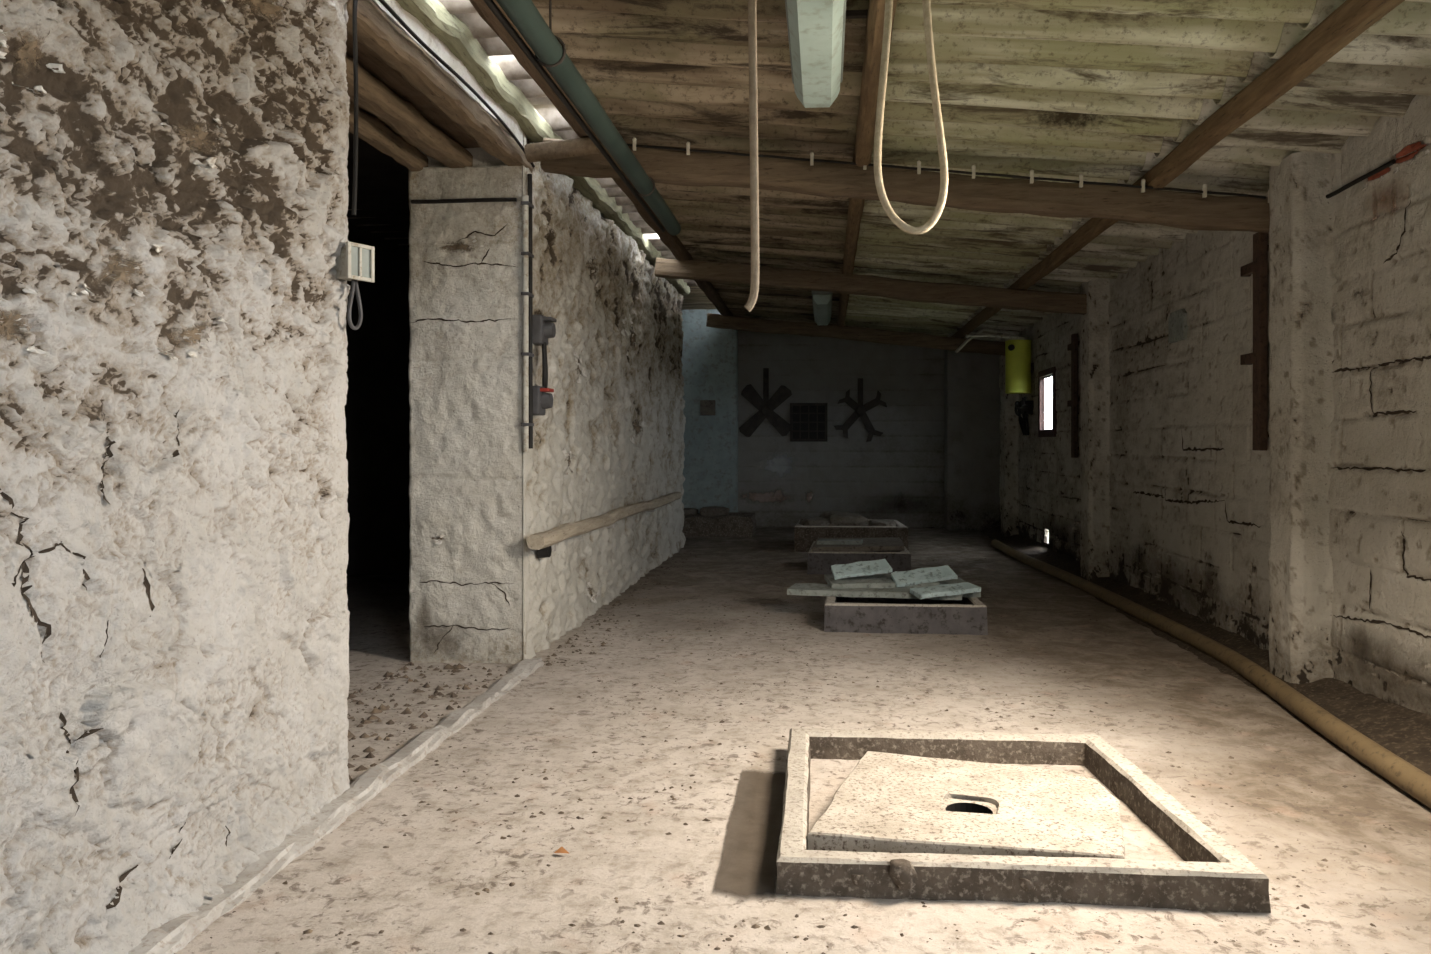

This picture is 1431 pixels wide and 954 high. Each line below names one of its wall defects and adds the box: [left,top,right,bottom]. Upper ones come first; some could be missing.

peeling [0,19,65,94]
peeling [160,118,240,169]
peeling [70,247,145,297]
crack [424,225,516,267]
peeling [0,298,47,354]
peeling [157,316,228,360]
crack [100,414,116,504]
crack [163,410,180,459]
crack [0,489,90,663]
crack [142,568,155,617]
crack [59,712,104,815]
crack [106,822,186,909]